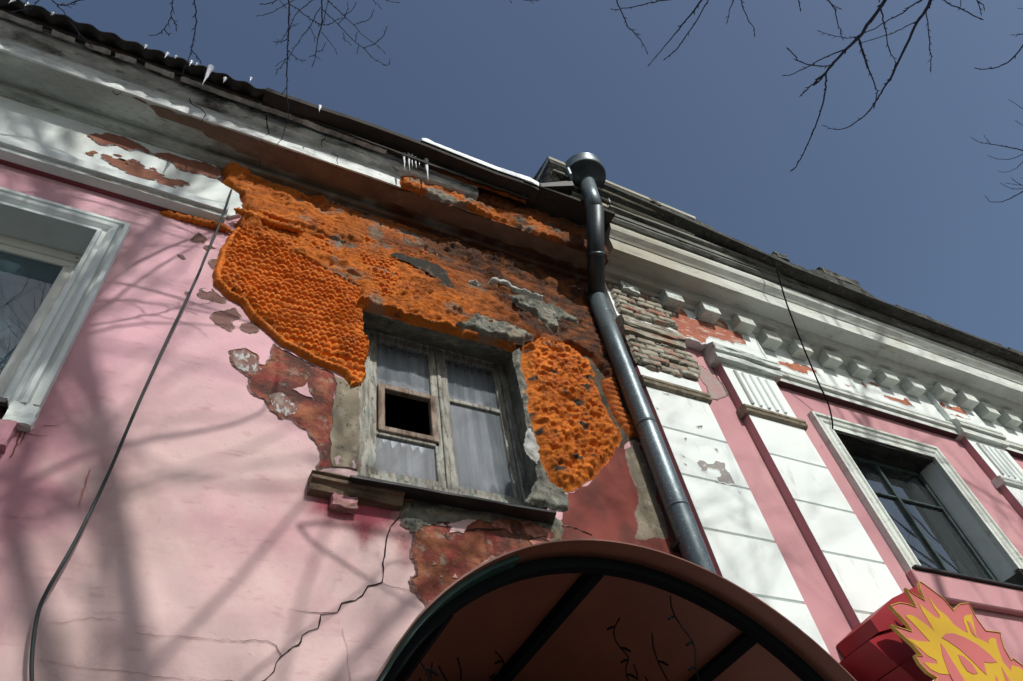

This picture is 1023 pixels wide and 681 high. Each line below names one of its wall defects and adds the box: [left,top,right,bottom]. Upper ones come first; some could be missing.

peeling [85,132,222,188]
peeling [132,97,587,269]
spalling [390,252,454,288]
spalling [184,288,259,334]
spalling [469,277,579,332]
spalling [606,282,747,346]
spalling [624,334,729,400]
peeling [228,344,361,471]
peeling [399,313,683,607]
peeling [680,447,741,494]
crack [49,517,407,681]